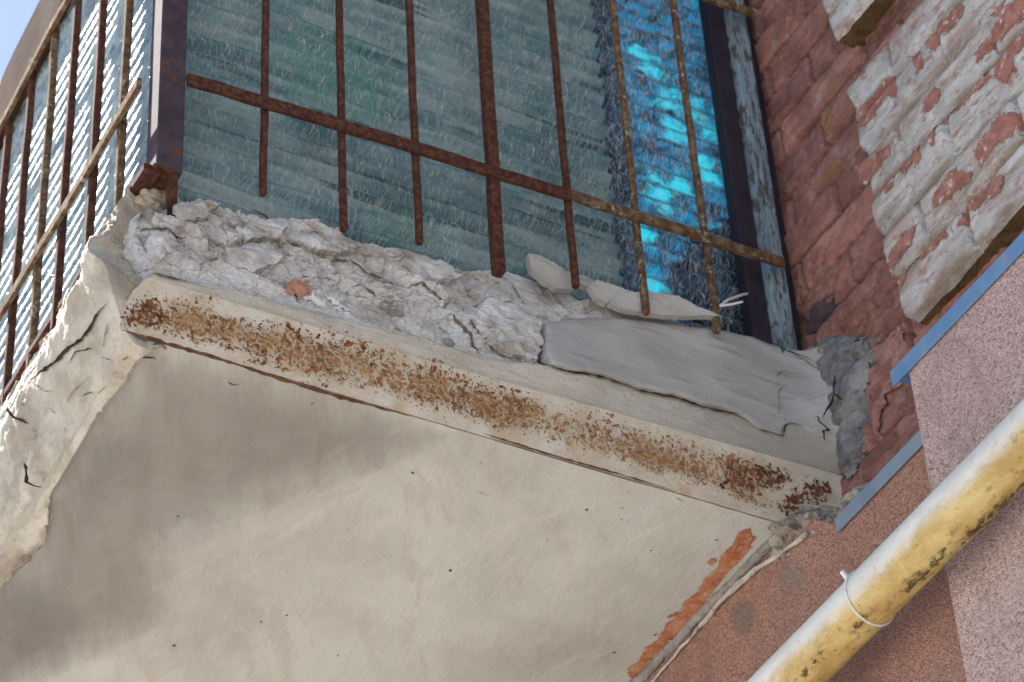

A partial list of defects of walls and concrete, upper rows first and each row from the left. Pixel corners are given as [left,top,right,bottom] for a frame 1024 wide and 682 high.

peeling [858,141,893,186]
peeling [856,76,897,128]
peeling [883,0,1024,194]
peeling [887,110,1024,289]
crack [24,463,40,487]
crack [6,304,155,438]
corrosion [120,291,832,516]
spalling [122,188,840,444]
crack [303,257,842,440]
peeling [627,528,756,678]